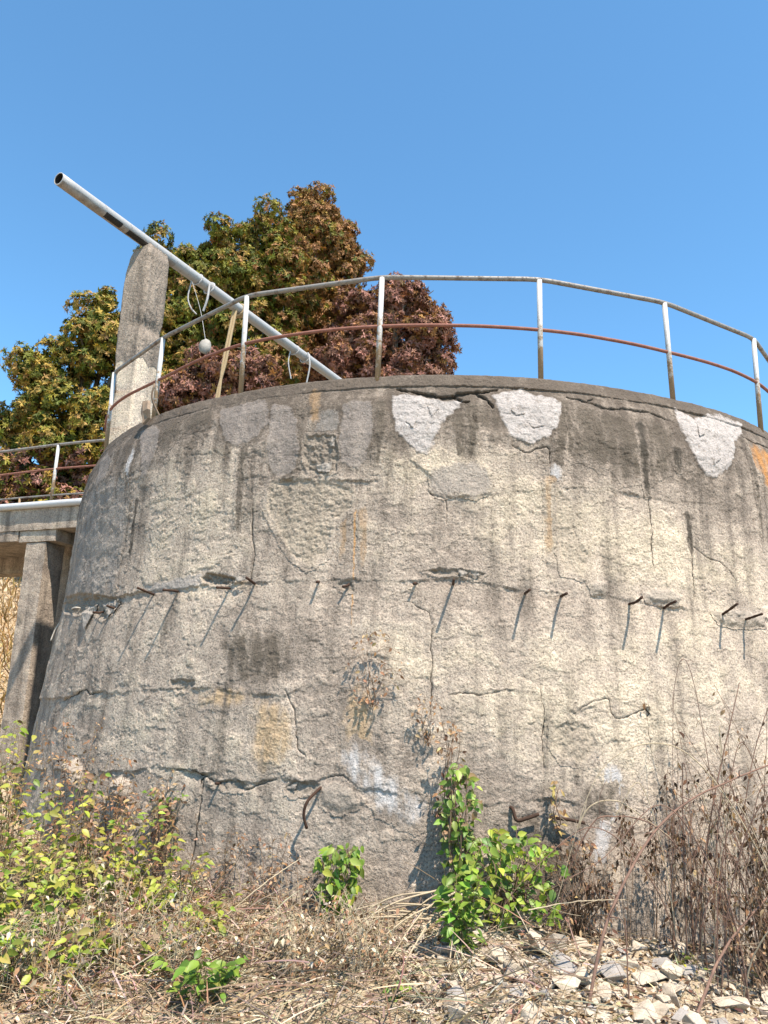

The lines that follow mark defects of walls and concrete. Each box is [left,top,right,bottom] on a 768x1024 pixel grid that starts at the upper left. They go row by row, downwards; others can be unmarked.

peeling [391,393,463,455]
peeling [491,387,562,445]
peeling [673,407,743,478]
rust [746,438,768,508]
rust [337,496,370,640]
water stain [681,508,695,559]
water stain [215,621,300,692]
crack [574,698,653,759]